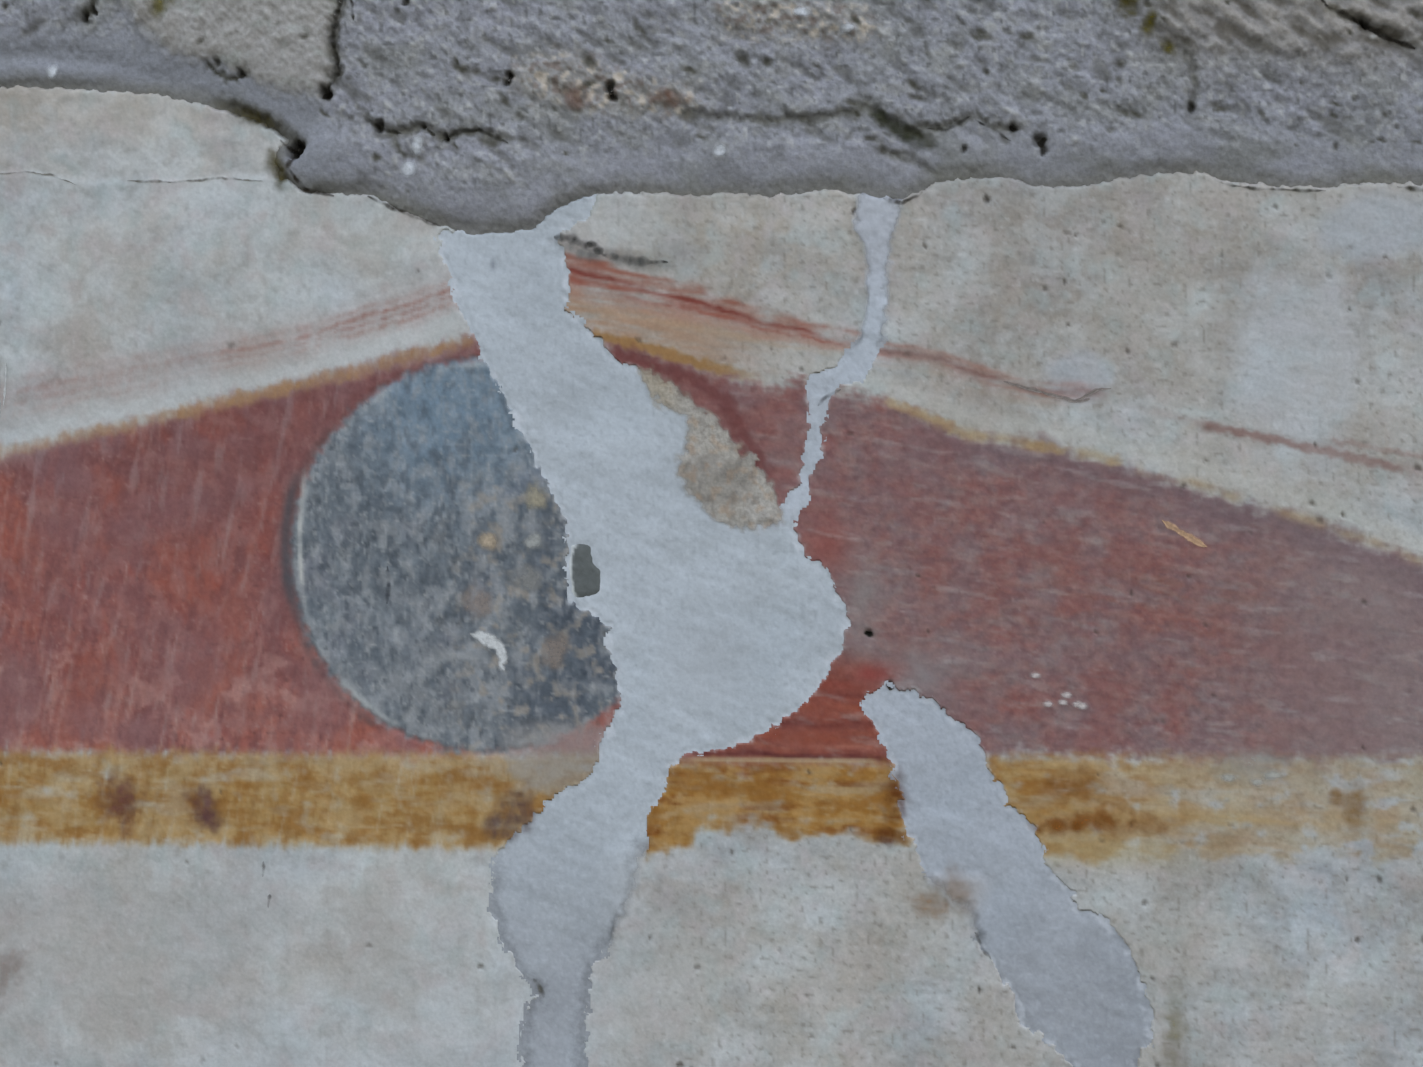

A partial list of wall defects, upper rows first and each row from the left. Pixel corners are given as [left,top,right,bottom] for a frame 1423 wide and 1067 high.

flaking render [433,194,851,1067]
flaking render [860,680,1154,1067]